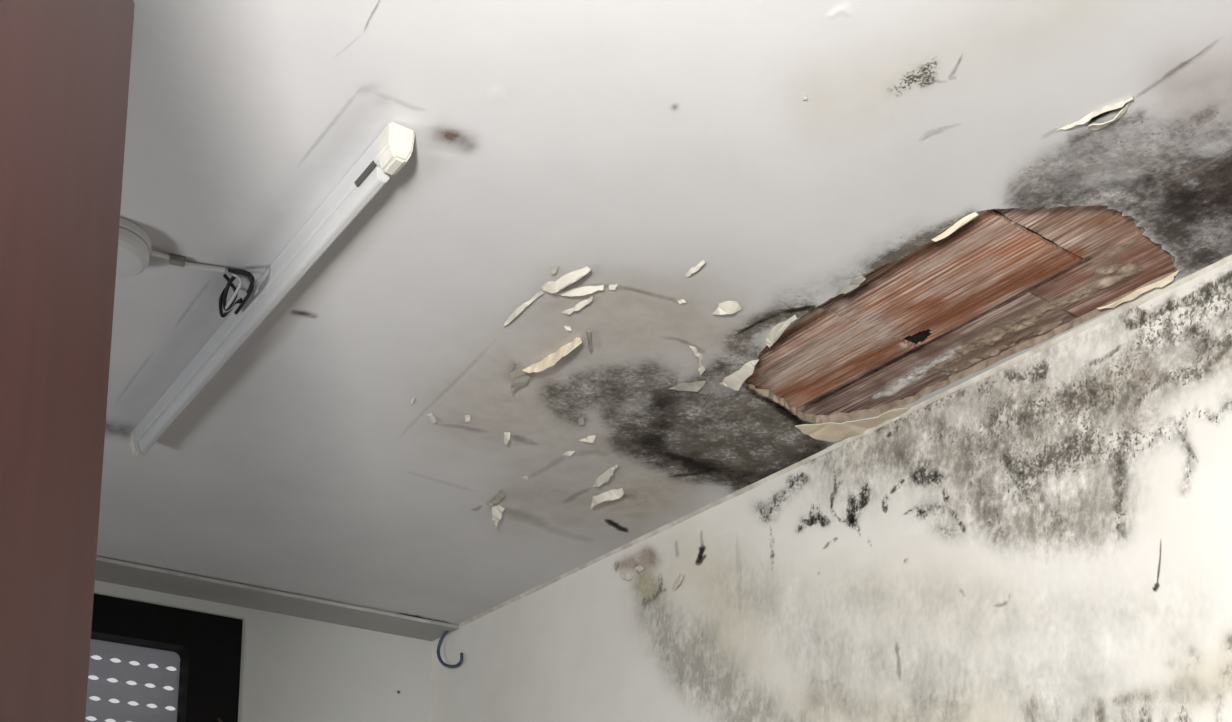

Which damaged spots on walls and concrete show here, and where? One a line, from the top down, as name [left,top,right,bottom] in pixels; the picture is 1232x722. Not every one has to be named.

crack [1057,96,1133,131]
damp [847,213,972,278]
damp [1011,112,1232,278]
peeling [504,266,617,394]
flaking render [669,205,1180,442]
peeling [563,415,596,456]
peeling [591,465,624,509]
damp [541,272,1232,542]
damp [647,600,771,722]